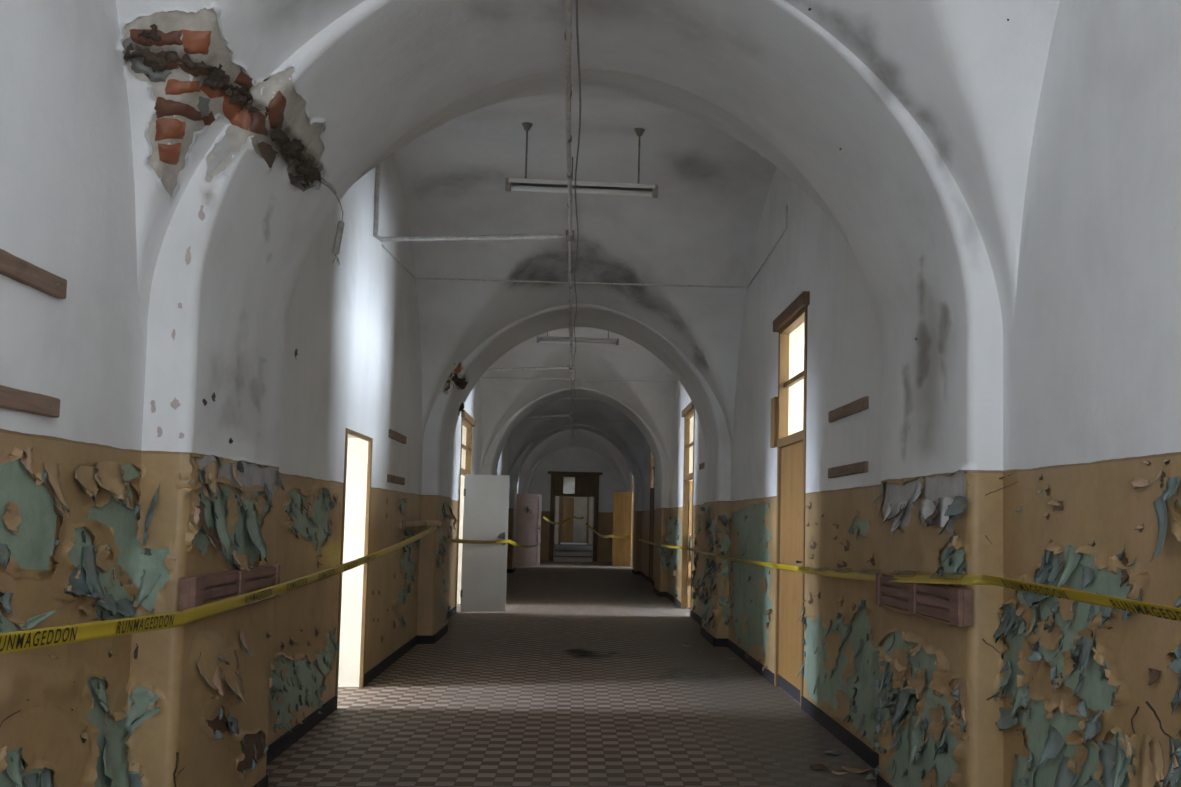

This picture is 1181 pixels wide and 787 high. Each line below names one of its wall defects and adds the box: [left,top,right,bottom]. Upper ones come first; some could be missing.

spalling [114,2,327,209]
spalling [439,357,470,398]
peeling [0,744,62,787]
peeling [71,665,167,787]
peeling [0,432,340,633]
peeling [197,626,339,783]
peeling [656,500,775,671]
peeling [797,592,974,787]
peeling [805,461,978,588]
peeling [992,457,1181,787]